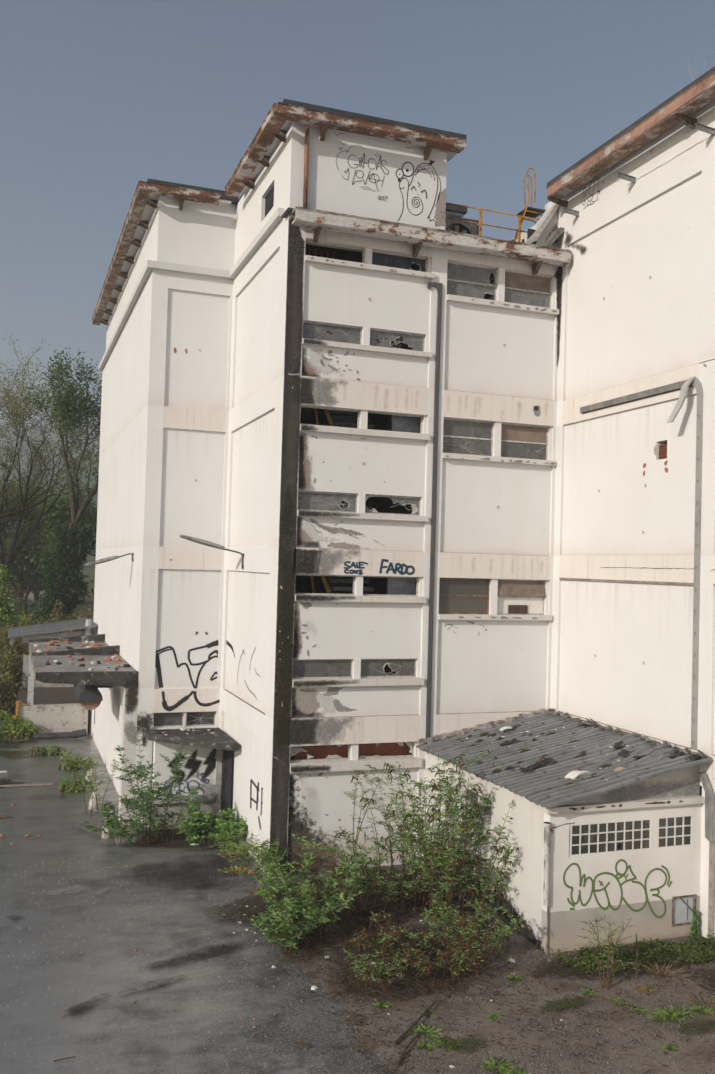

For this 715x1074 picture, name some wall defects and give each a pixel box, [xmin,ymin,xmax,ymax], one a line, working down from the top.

peeling [316,350,360,381]
peeling [310,496,384,546]